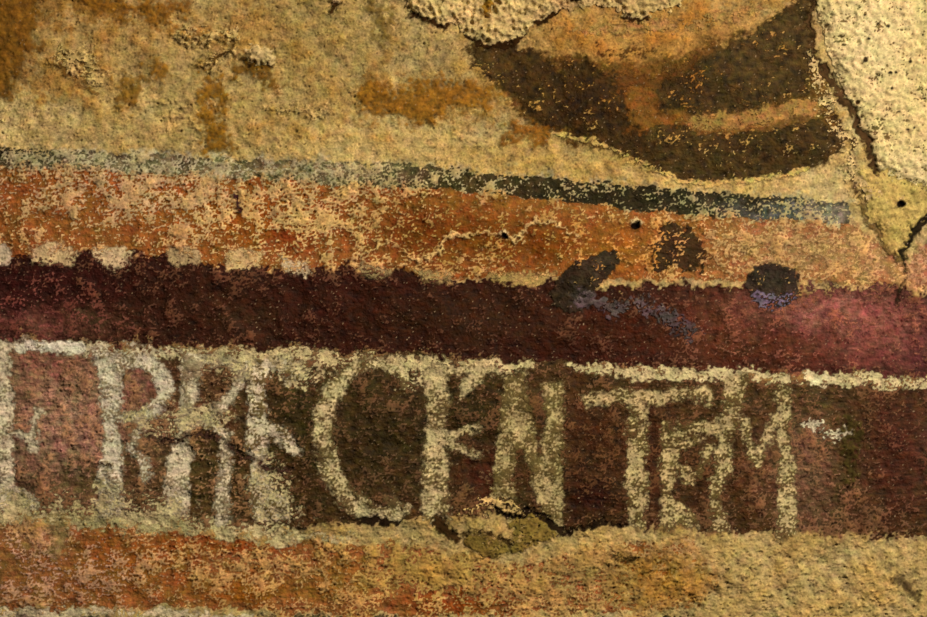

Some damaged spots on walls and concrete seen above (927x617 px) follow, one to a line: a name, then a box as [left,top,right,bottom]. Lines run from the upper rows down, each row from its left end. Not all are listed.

crack [803,0,927,306]
flaking render [464,513,557,559]